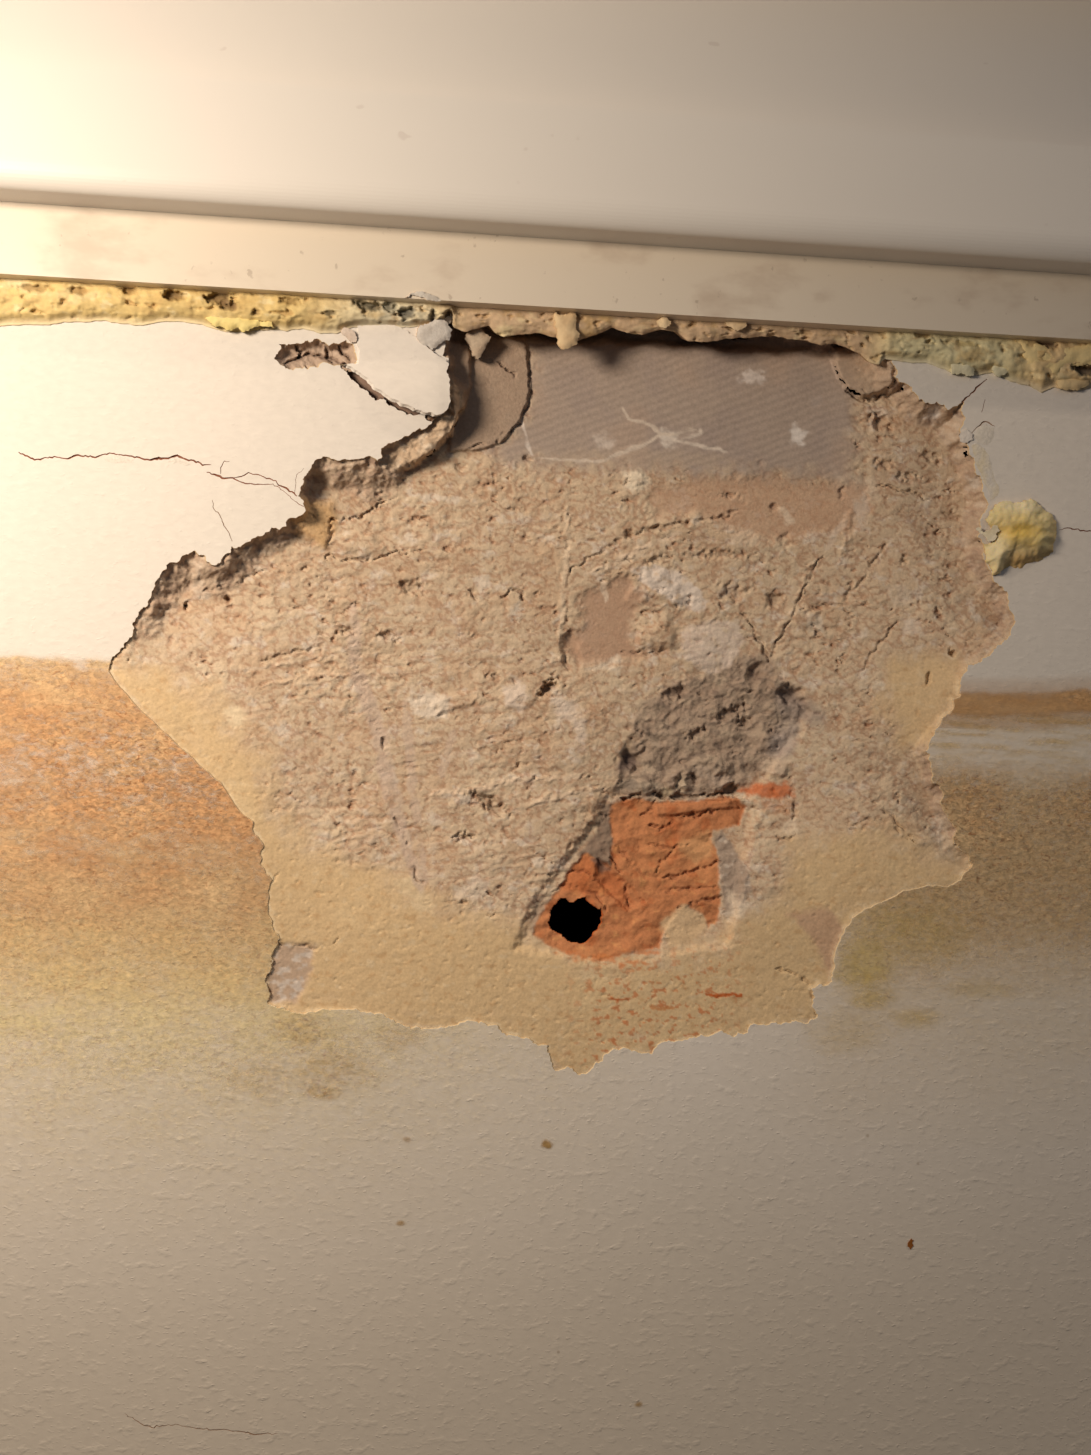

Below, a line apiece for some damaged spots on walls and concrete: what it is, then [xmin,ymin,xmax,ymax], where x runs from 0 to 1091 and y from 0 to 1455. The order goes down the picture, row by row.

crack [18,452,304,540]
spalling [108,316,1016,1075]
damp [940,689,1091,748]
damp [0,657,395,1071]
damp [846,774,1091,1002]